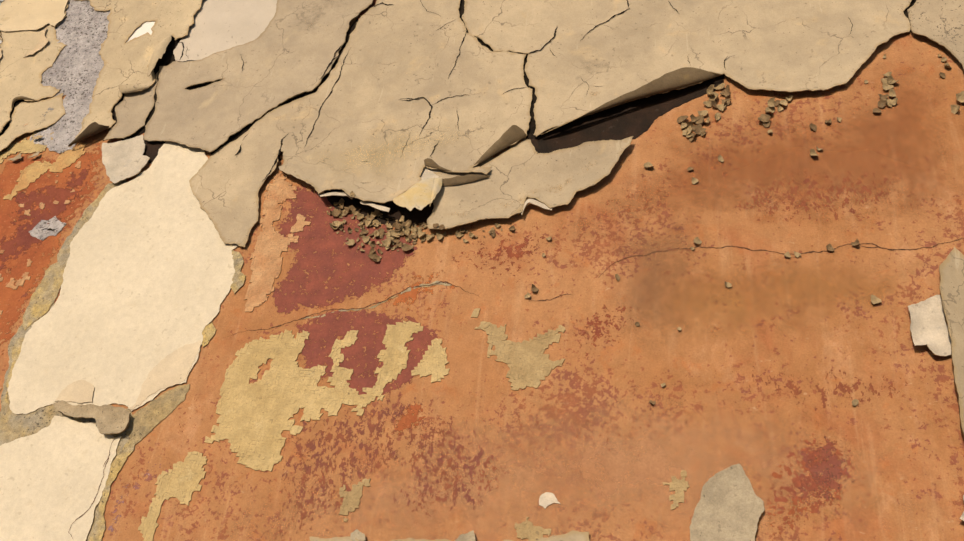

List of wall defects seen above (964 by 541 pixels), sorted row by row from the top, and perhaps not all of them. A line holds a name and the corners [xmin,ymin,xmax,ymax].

crack [141,73,159,133]
crack [209,2,393,178]
crack [402,0,557,156]
peeling [189,0,964,312]
crack [903,0,916,32]
corrosion [0,143,102,355]
flaking render [0,0,373,541]
peeling [138,281,451,541]
corrosion [385,272,440,311]
peeling [689,463,764,541]
corrosion [757,421,874,536]
peeling [907,246,964,434]